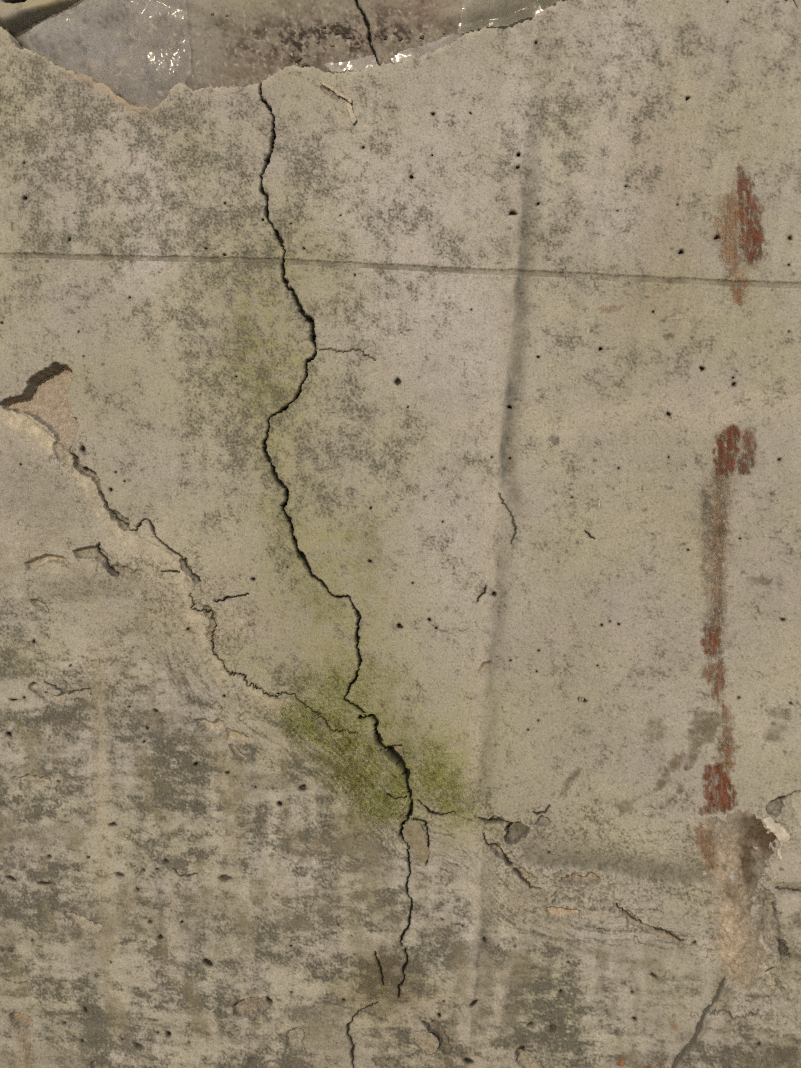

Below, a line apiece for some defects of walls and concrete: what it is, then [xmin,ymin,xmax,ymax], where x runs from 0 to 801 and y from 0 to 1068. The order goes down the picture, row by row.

crack [353,0,381,66]
rust [718,166,764,305]
spalling [0,362,101,493]
rust [713,425,756,484]
spalling [103,506,130,532]
crack [68,83,550,1068]
rust [701,503,727,715]
crack [43,679,66,694]
rust [700,731,736,814]
peeling [761,799,790,861]
spalling [761,888,793,966]
crack [670,976,760,1068]